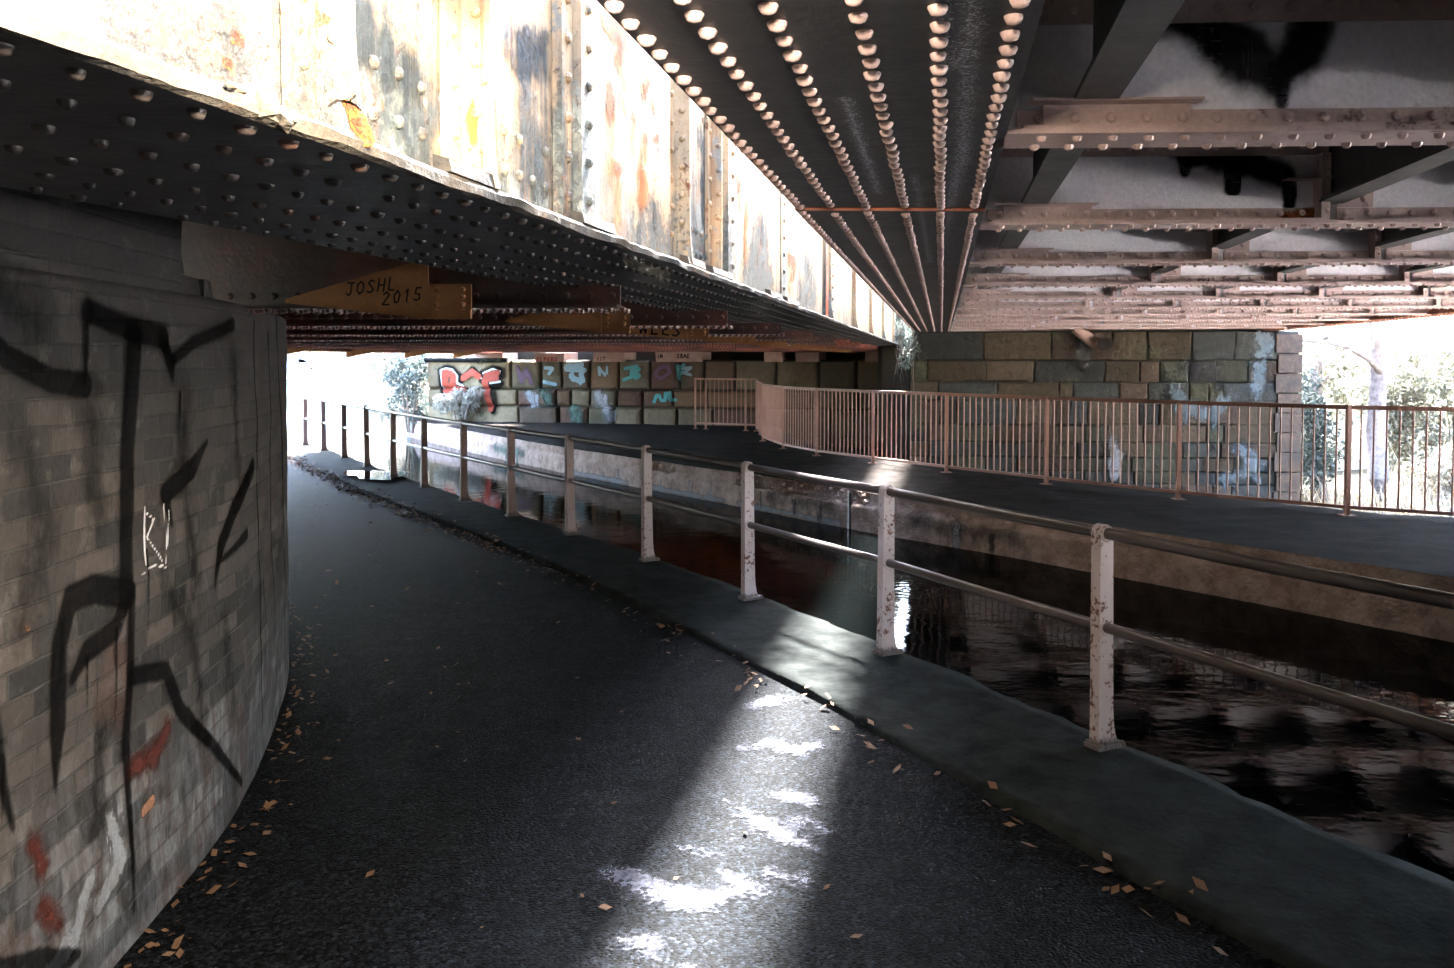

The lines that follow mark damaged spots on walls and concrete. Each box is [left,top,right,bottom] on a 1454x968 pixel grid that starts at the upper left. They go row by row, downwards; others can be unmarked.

rust [342,98,375,147]
rust [601,10,659,227]
rust [736,174,748,265]